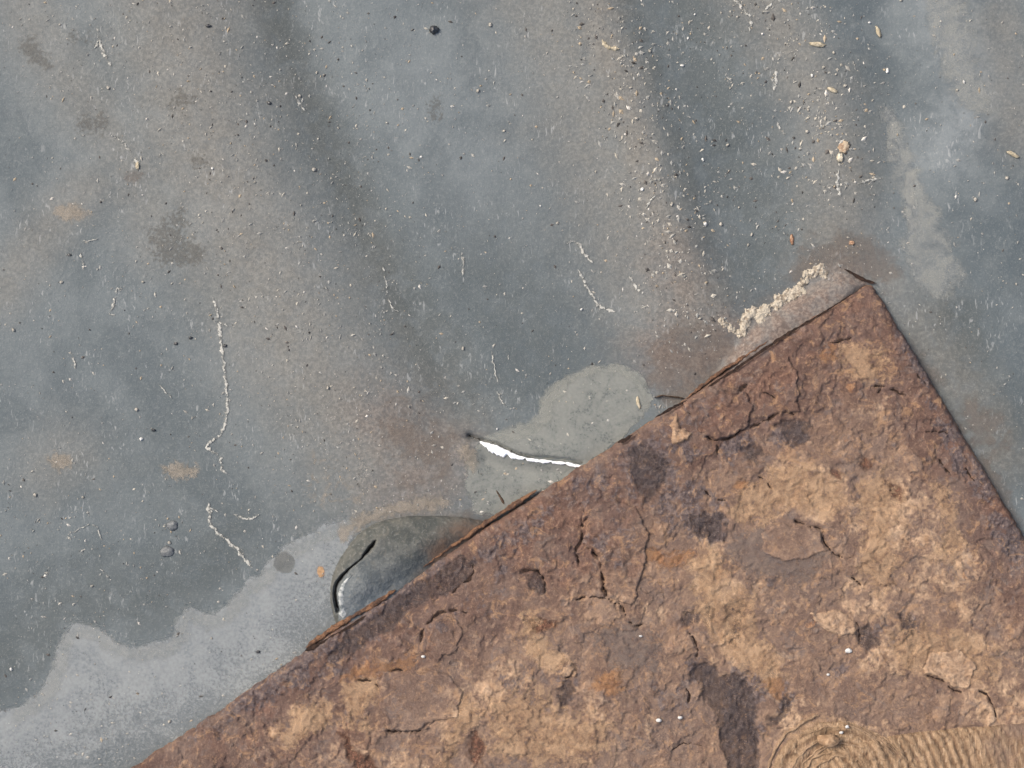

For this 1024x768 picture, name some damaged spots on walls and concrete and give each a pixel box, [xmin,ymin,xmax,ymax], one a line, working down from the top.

damp [718,263,829,338]
crack [205,298,229,473]
damp [465,364,653,515]
corrosion [670,386,754,444]
crack [206,503,259,568]
corrosion [582,500,650,605]
corrosion [761,523,827,562]
damp [0,520,357,768]
corrosion [378,667,464,732]
corrosion [810,610,857,637]
corrosion [923,649,977,689]